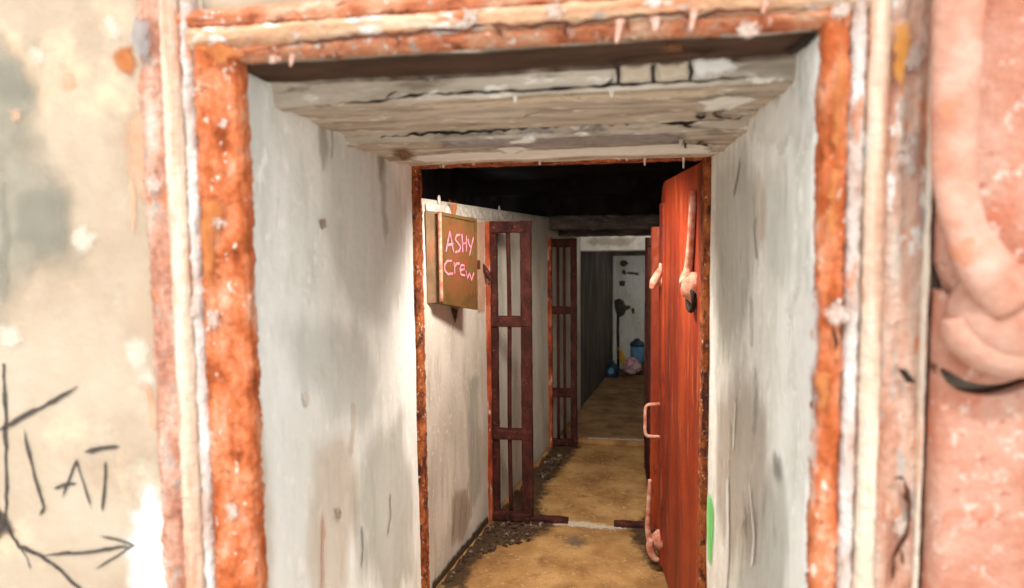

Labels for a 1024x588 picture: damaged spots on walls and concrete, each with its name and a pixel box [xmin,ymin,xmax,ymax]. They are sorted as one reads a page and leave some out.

corrosion [199,32,818,82]
crack [314,64,763,148]
damp [0,47,63,290]
corrosion [200,200,223,284]
corrosion [816,373,830,410]